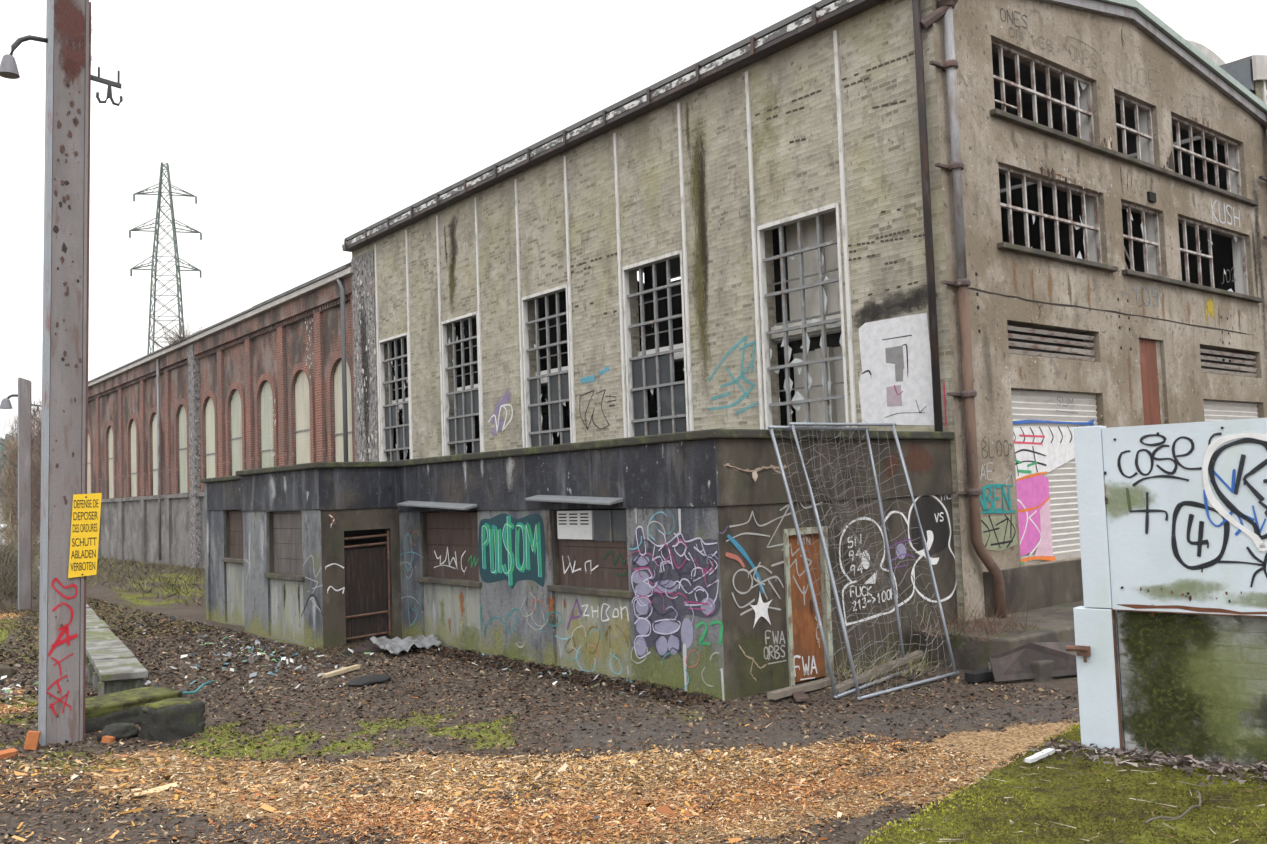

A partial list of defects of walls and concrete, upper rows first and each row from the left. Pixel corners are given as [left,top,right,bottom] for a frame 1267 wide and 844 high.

corrosion [54,0,94,85]
leakage [444,220,458,304]
leakage [686,108,708,378]
peeling [355,271,377,462]